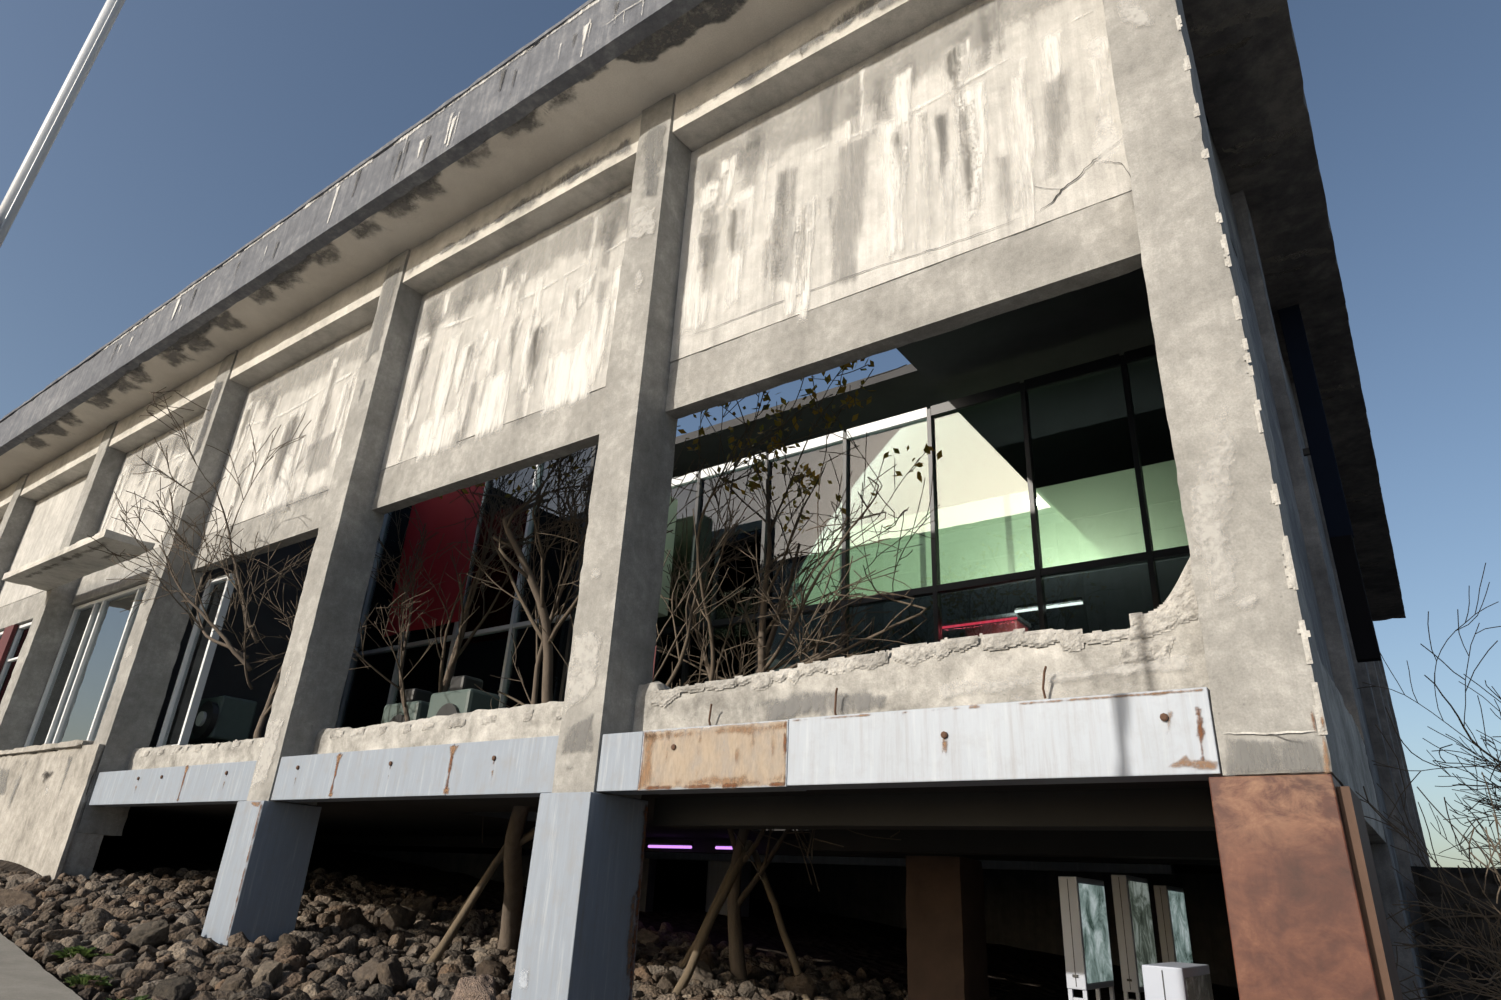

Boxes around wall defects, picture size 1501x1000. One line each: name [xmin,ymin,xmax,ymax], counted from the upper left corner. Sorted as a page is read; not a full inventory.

water stain [1043,33,1061,95]
water stain [399,126,665,460]
water stain [681,0,1054,330]
crack [692,141,1131,335]
spalling [650,558,1198,726]
corrosion [1021,689,1216,769]
corrosion [627,720,799,1000]